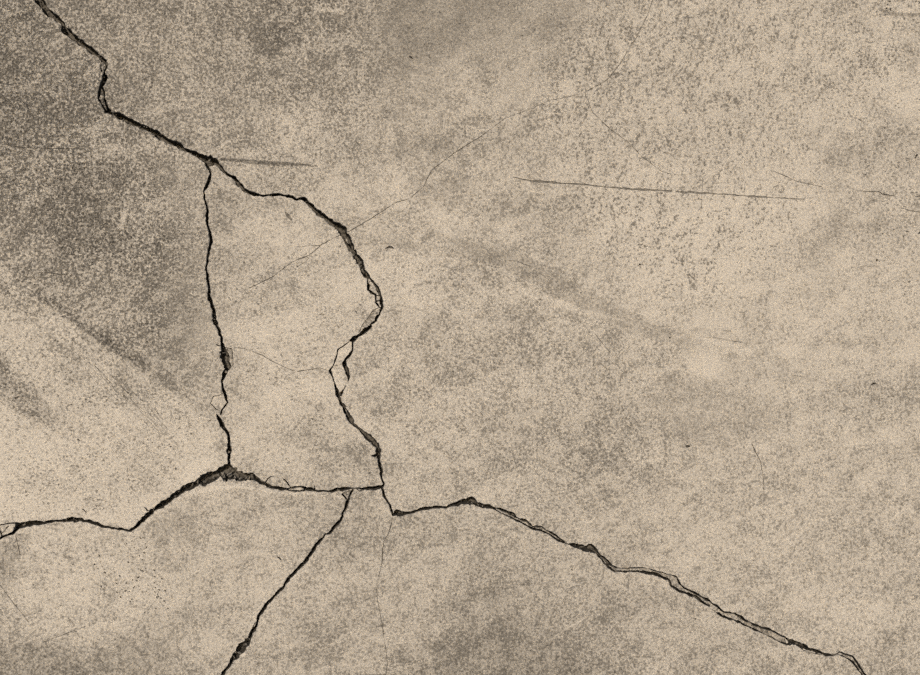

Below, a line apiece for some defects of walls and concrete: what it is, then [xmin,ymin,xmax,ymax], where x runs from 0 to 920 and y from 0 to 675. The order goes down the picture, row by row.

crack [514,0,805,229]
crack [0,0,393,675]
crack [392,496,867,675]